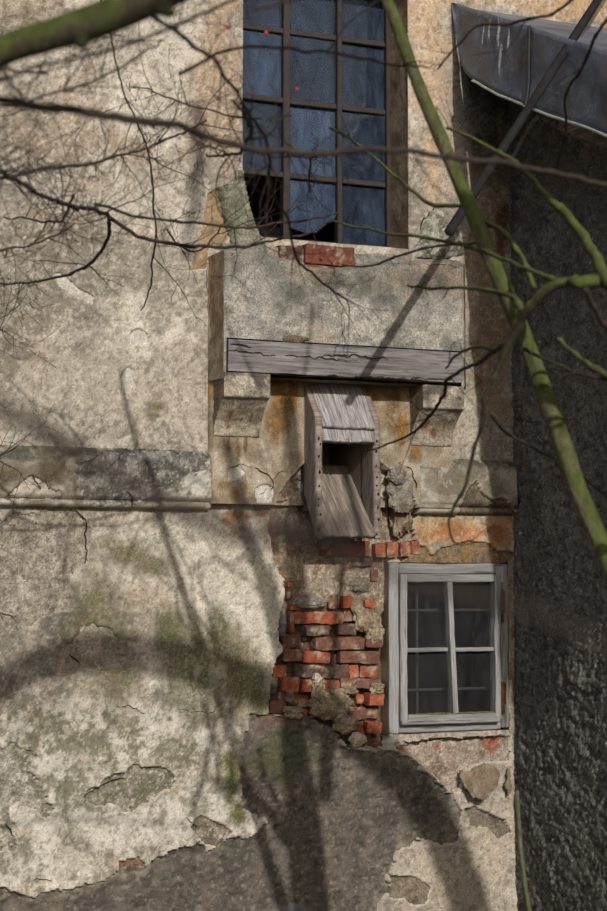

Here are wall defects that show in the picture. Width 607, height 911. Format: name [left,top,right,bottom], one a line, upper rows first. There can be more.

peeling [192,190,227,270]
peeling [97,449,208,489]
crack [77,511,88,563]
spalling [0,463,515,911]